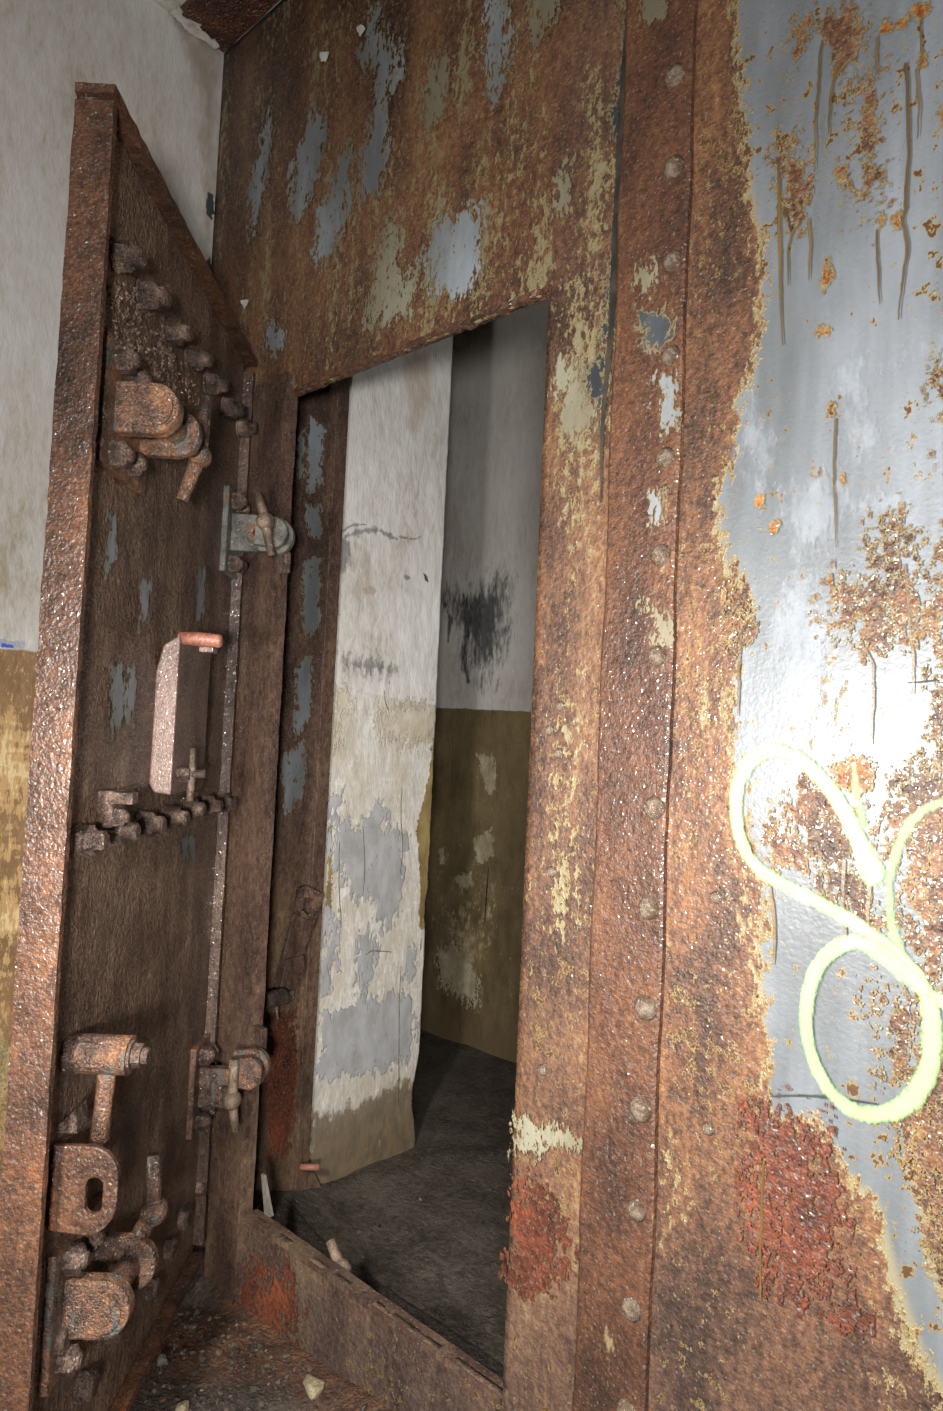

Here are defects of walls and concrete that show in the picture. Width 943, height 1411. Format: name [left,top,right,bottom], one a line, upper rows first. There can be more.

rust [762,0,943,345]
rust [105,280,200,418]
rust [710,579,768,716]
peeling [314,682,498,1083]
rust [258,1006,301,1168]
rust [222,1250,309,1346]
rust [499,1109,583,1305]
rust [731,1086,880,1344]